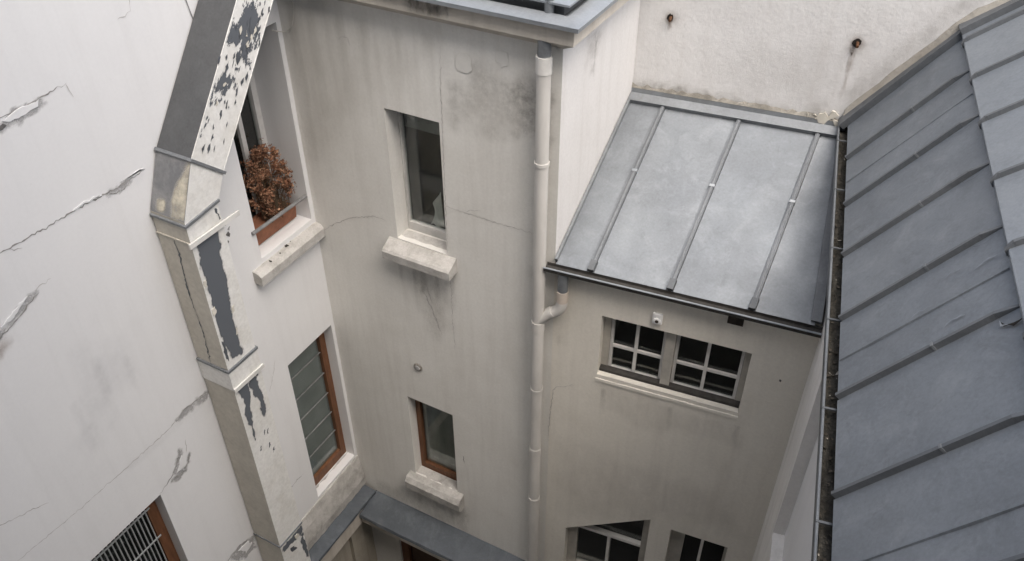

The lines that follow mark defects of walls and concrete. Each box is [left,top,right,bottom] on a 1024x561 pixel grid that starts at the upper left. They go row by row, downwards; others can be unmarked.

peeling [200,0,270,153]
crack [0,168,145,253]
peeling [197,208,243,361]
crack [19,392,208,560]
peeling [238,374,275,452]
peeling [283,526,309,557]